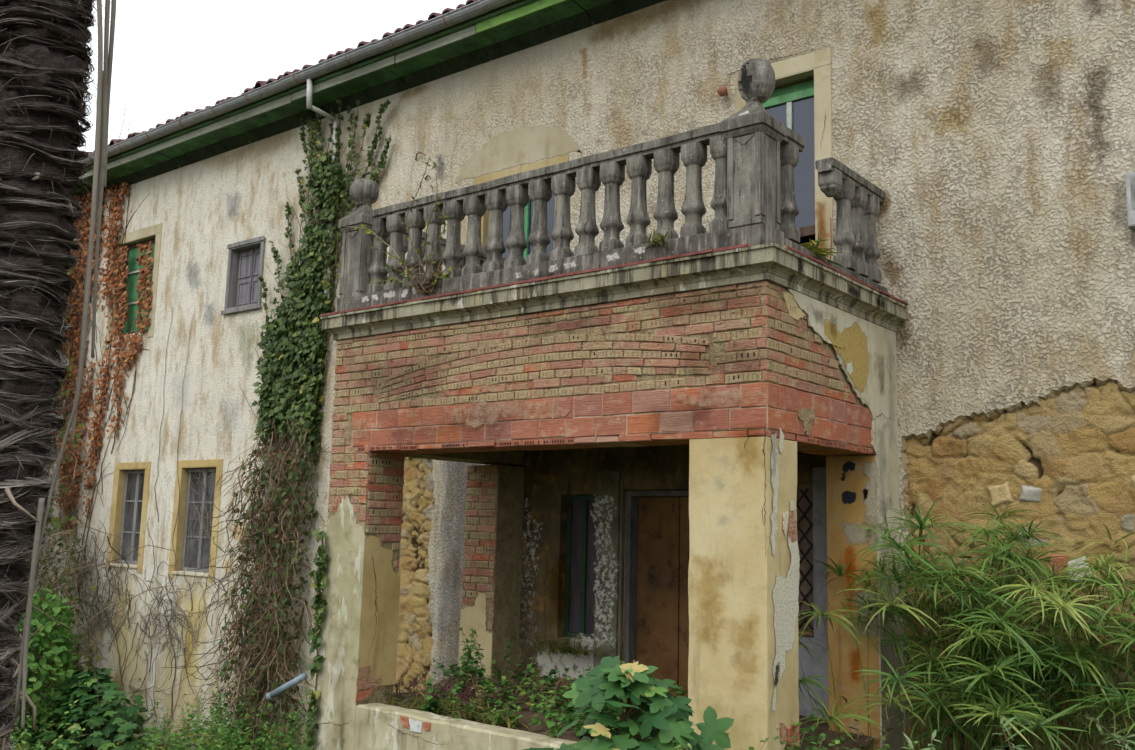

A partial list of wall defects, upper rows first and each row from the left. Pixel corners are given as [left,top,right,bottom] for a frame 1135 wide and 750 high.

spalling [328,281,869,750]
peeling [841,461,884,550]
spalling [900,378,1135,750]